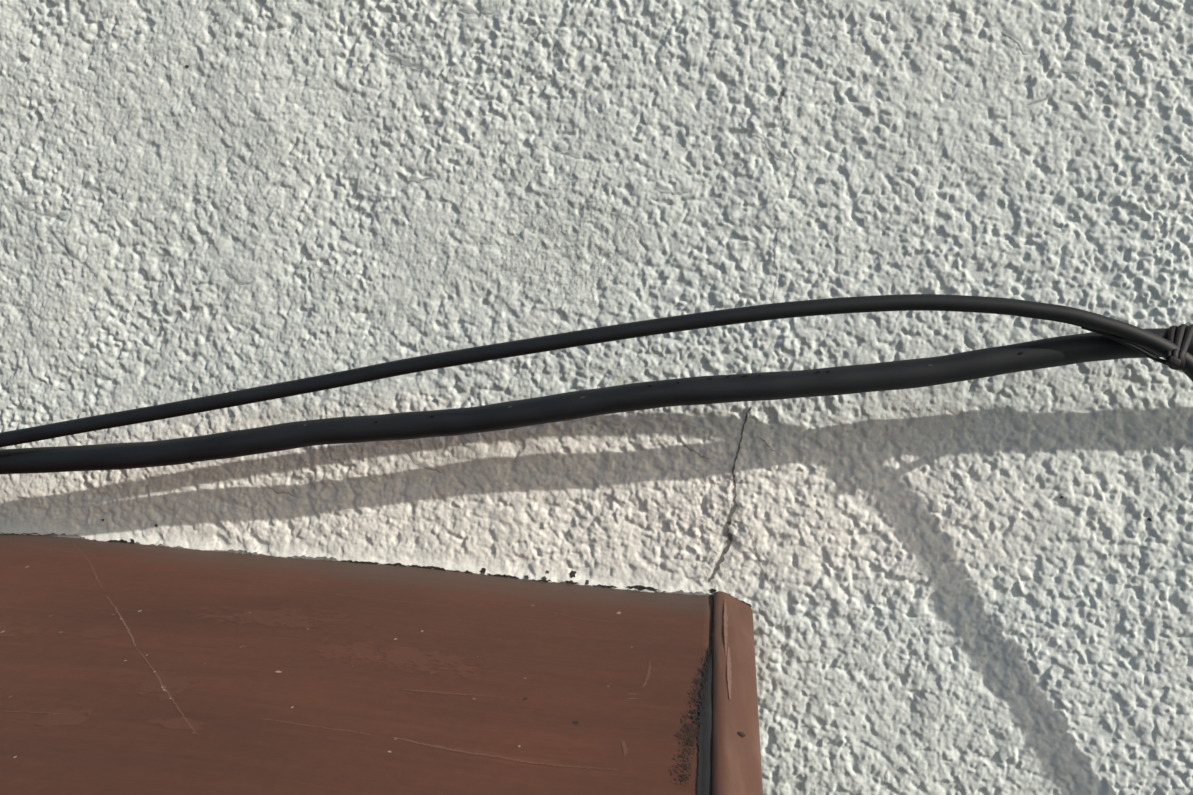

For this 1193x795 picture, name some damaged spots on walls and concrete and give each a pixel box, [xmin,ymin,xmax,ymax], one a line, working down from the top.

crack [682,407,776,590]